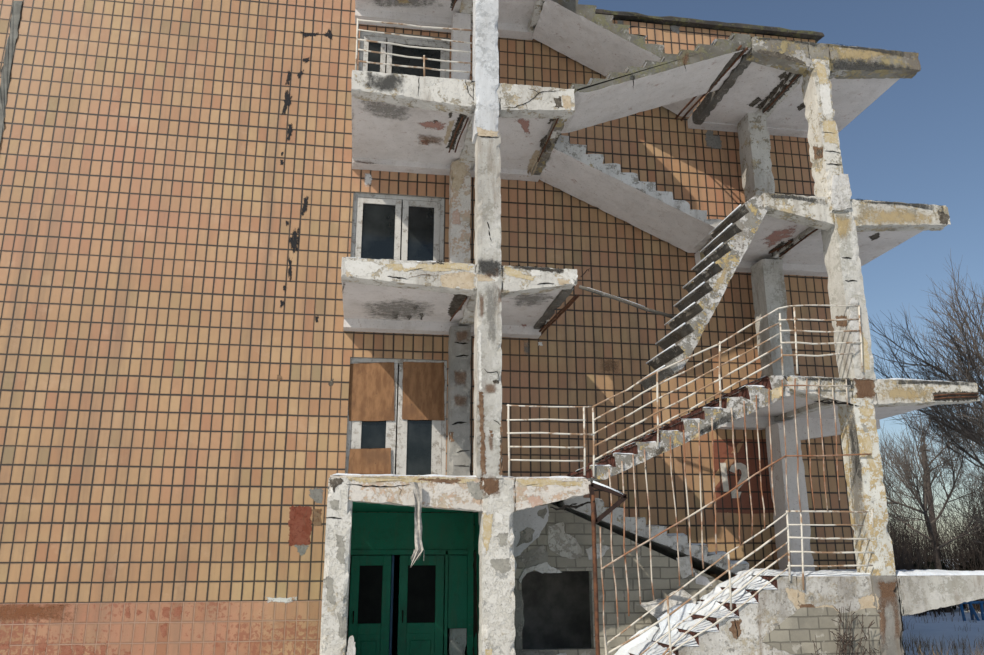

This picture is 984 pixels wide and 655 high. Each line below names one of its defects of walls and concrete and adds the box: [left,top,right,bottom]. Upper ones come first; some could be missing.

leakage [367,73,402,91]
leakage [363,100,406,120]
spalling [419,113,469,153]
spalling [527,95,572,177]
peeling [675,45,840,159]
peeling [830,173,852,220]
spalling [763,226,818,257]
peeling [836,298,870,373]
peeling [288,330,503,556]
peeling [482,478,610,655]
leakage [0,604,65,620]
peeling [323,576,356,655]